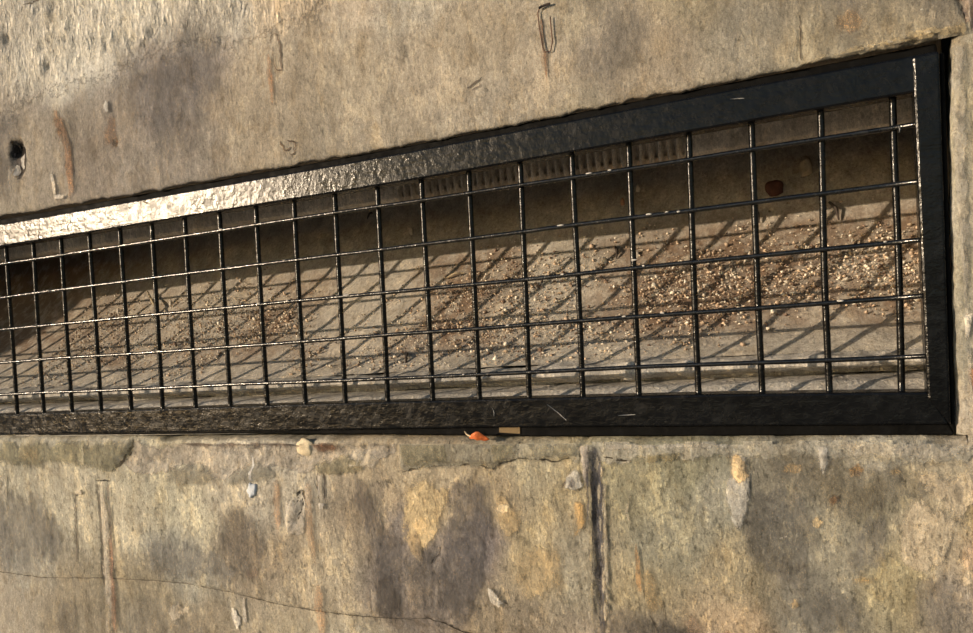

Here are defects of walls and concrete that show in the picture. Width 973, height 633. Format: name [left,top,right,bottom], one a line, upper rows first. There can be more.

spalling [815,0,973,59]
water stain [574,502,584,535]
crack [0,571,470,633]
water stain [354,480,518,617]
water stain [517,549,560,599]